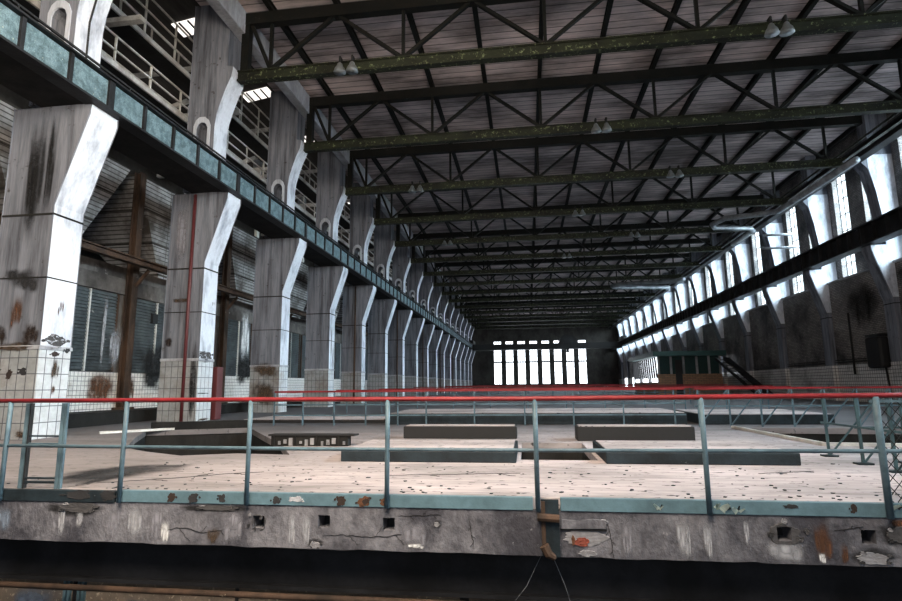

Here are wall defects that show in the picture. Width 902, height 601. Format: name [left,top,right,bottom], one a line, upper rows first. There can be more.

water stain [26,127,55,222]
rust [0,302,38,351]
spalling [41,334,70,357]
rust [88,375,112,398]
spalling [854,526,902,565]